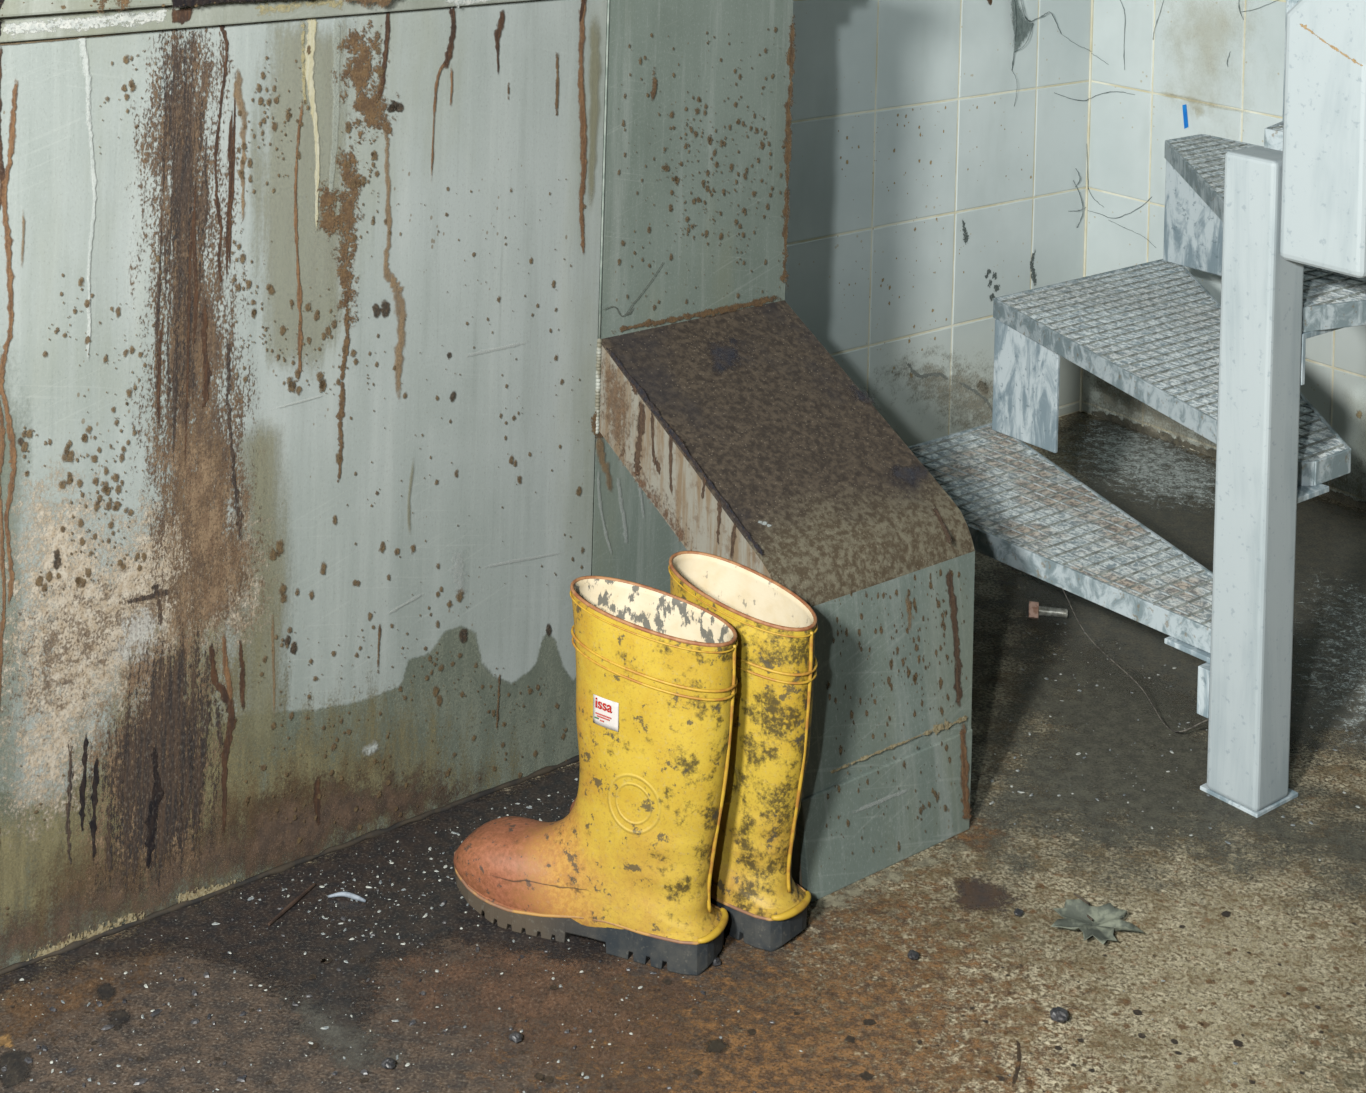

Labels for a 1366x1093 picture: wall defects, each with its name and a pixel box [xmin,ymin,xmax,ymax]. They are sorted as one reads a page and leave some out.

rust [549,0,599,267]
rust [0,0,567,902]
damp [0,397,579,969]